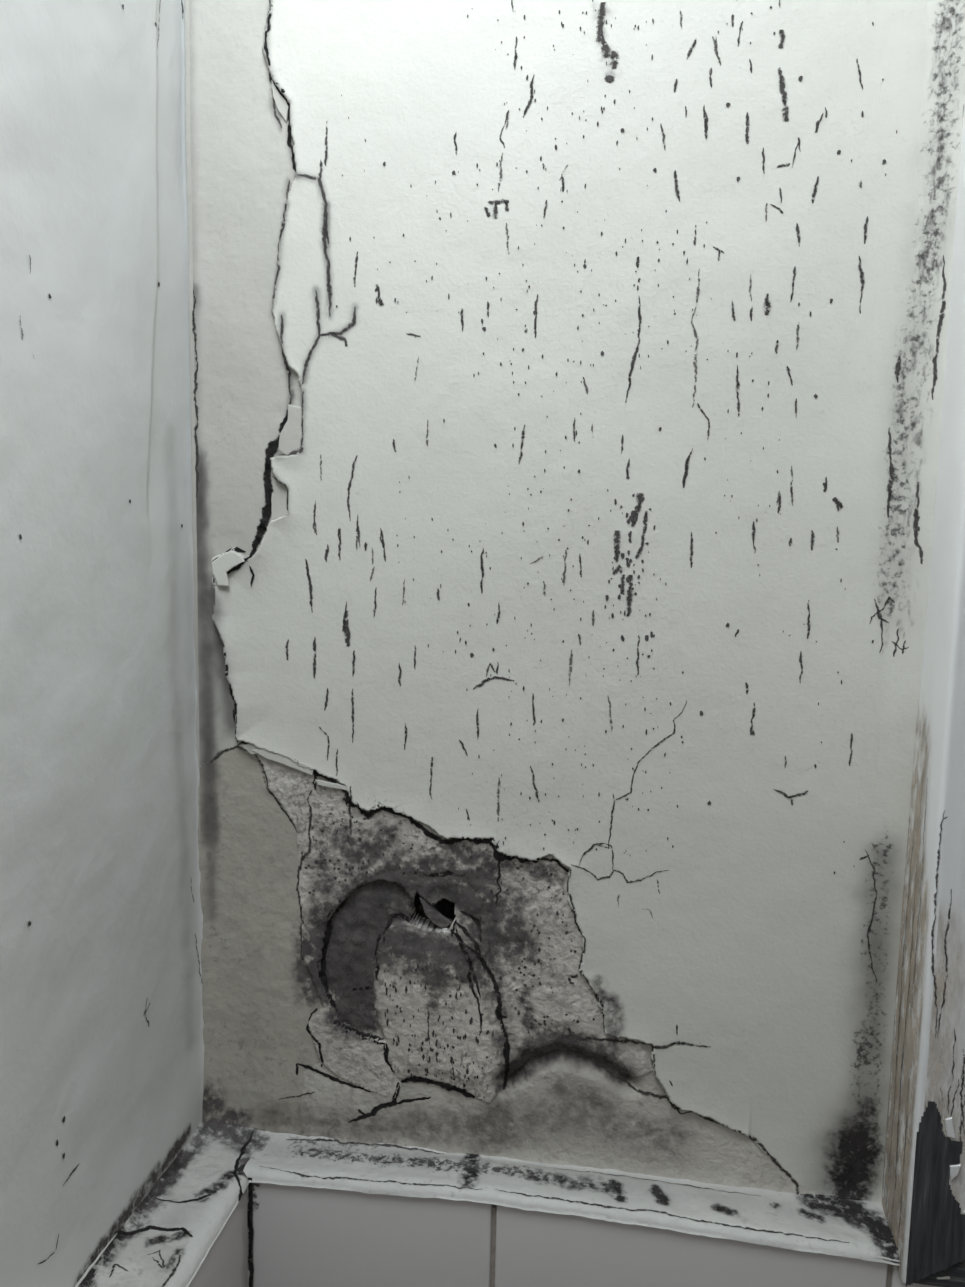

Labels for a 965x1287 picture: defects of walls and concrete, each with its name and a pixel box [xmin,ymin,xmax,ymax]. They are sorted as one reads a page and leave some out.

crack [858,180,869,314]
damp [874,0,959,657]
crack [109,0,849,1287]
peeling [185,0,818,1195]
crack [847,733,855,766]
damp [295,806,632,1202]
crack [889,788,965,1248]
peeling [91,1229,189,1287]
peeling [151,1138,236,1203]
damp [651,1185,669,1205]
damp [712,1204,737,1215]
peeling [906,1101,965,1286]